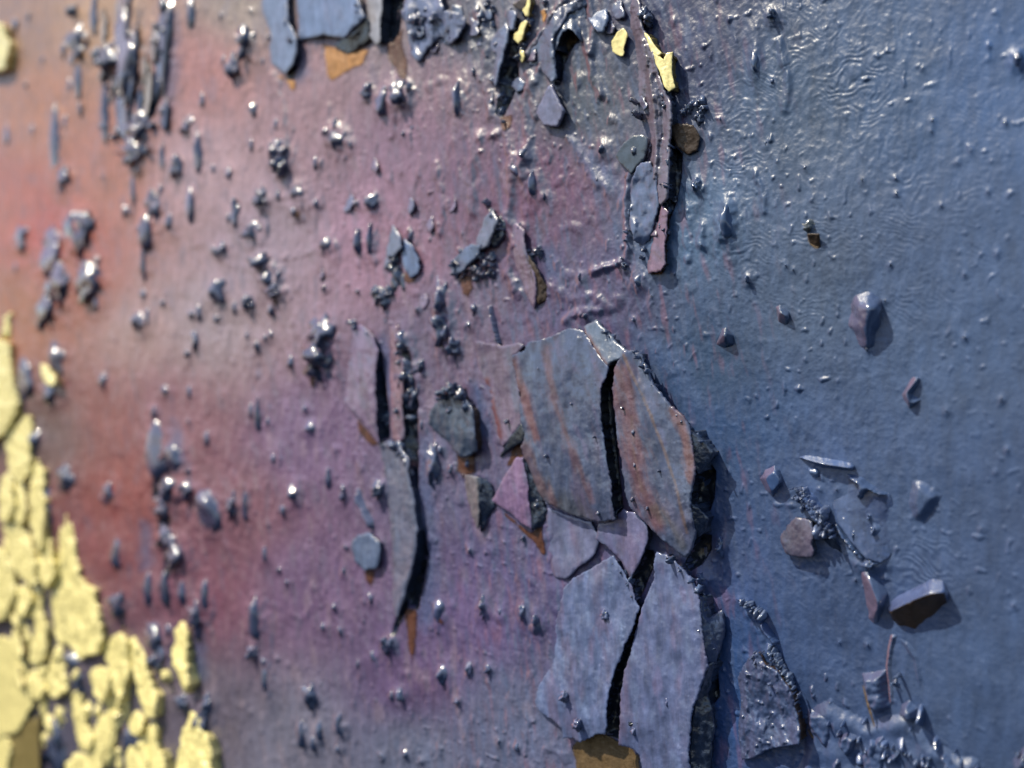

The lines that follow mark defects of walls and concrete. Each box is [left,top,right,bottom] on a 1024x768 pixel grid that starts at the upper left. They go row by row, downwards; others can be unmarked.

peeling [261,0,587,127]
peeling [605,0,708,274]
crack [667,147,683,218]
peeling [419,197,547,310]
crack [382,346,419,468]
rust [507,444,523,466]
crack [608,365,623,512]
peeling [0,312,222,768]
crack [389,530,429,637]
rust [505,513,545,554]
peeling [464,319,726,768]
crack [606,550,654,739]